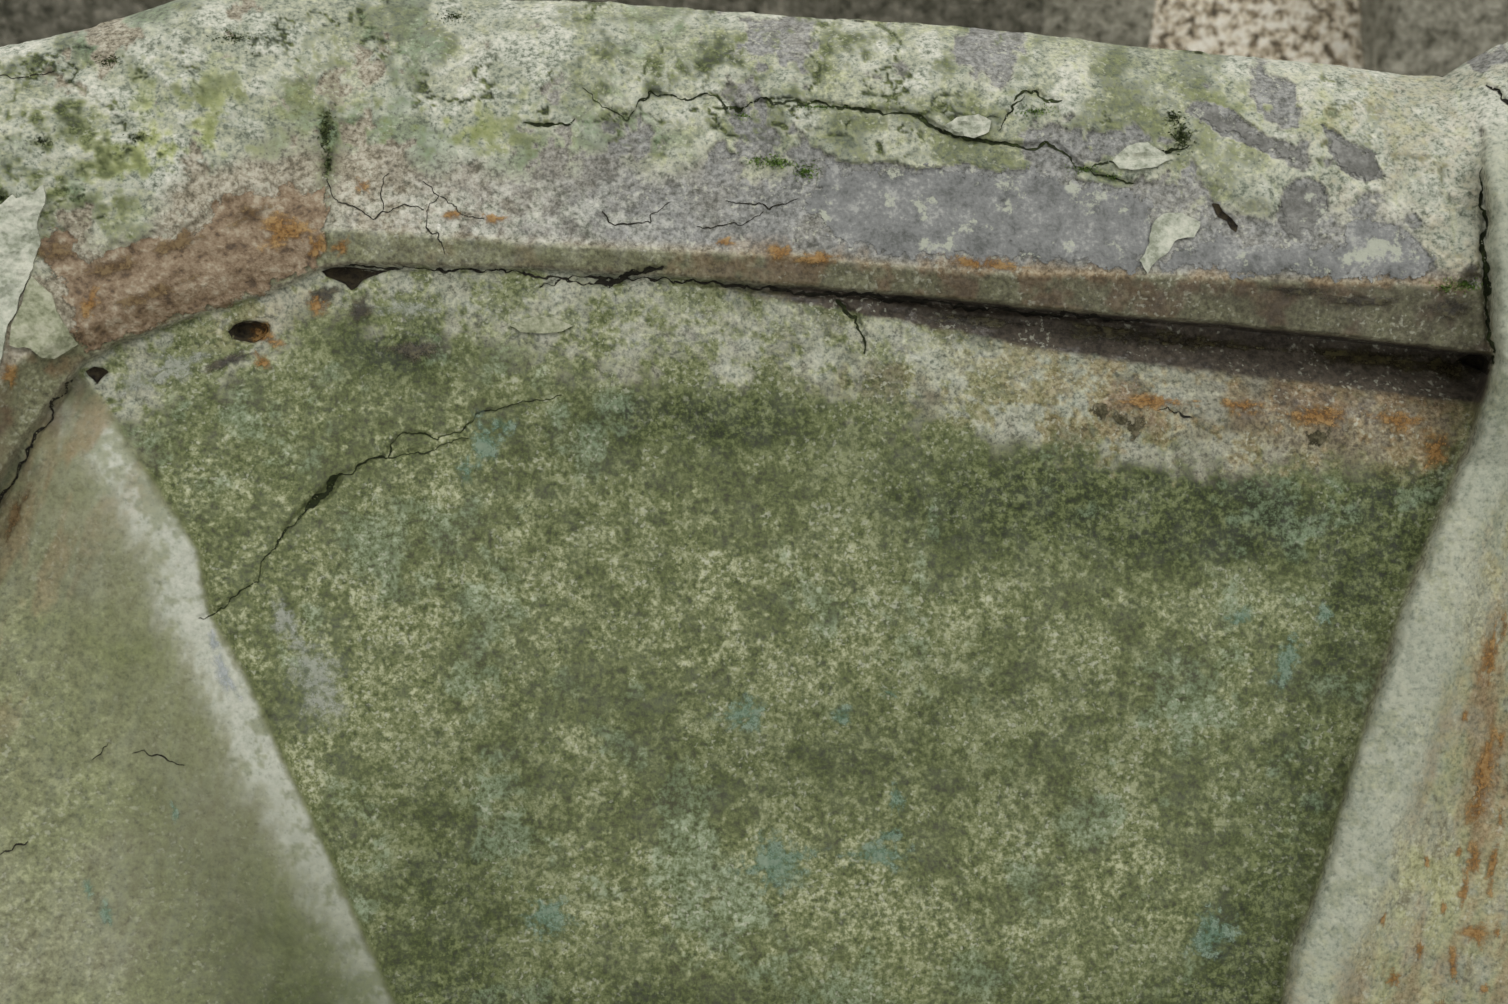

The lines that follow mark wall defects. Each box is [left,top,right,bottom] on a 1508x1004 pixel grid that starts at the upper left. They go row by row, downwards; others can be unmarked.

crack [524,88,1134,184]
flaking render [942,114,991,138]
spalling [1193,101,1302,162]
spalling [1317,122,1382,181]
spalling [803,142,1438,283]
crack [327,173,1141,354]
rust [937,255,1030,272]
rust [252,323,286,369]
crack [0,380,73,503]
crack [199,395,560,619]
rust [1441,725,1505,913]
rust [1449,922,1500,982]